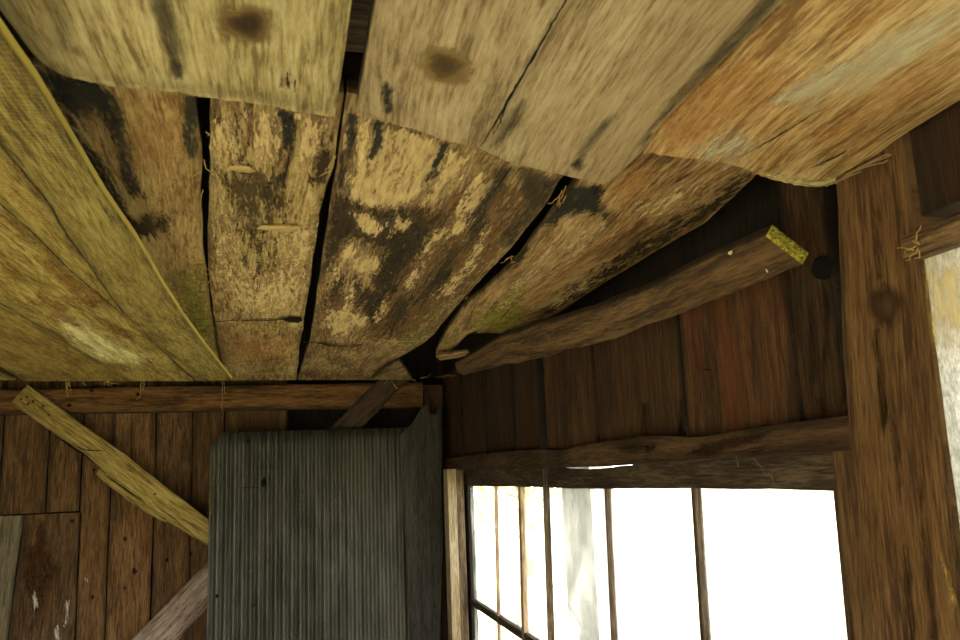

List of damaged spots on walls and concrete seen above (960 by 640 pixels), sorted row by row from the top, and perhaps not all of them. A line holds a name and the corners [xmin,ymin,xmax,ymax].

leakage [33,65,175,242]
leakage [181,96,198,163]
leakage [219,103,298,288]
leakage [366,83,394,161]
leakage [304,110,548,338]
crack [478,0,567,148]